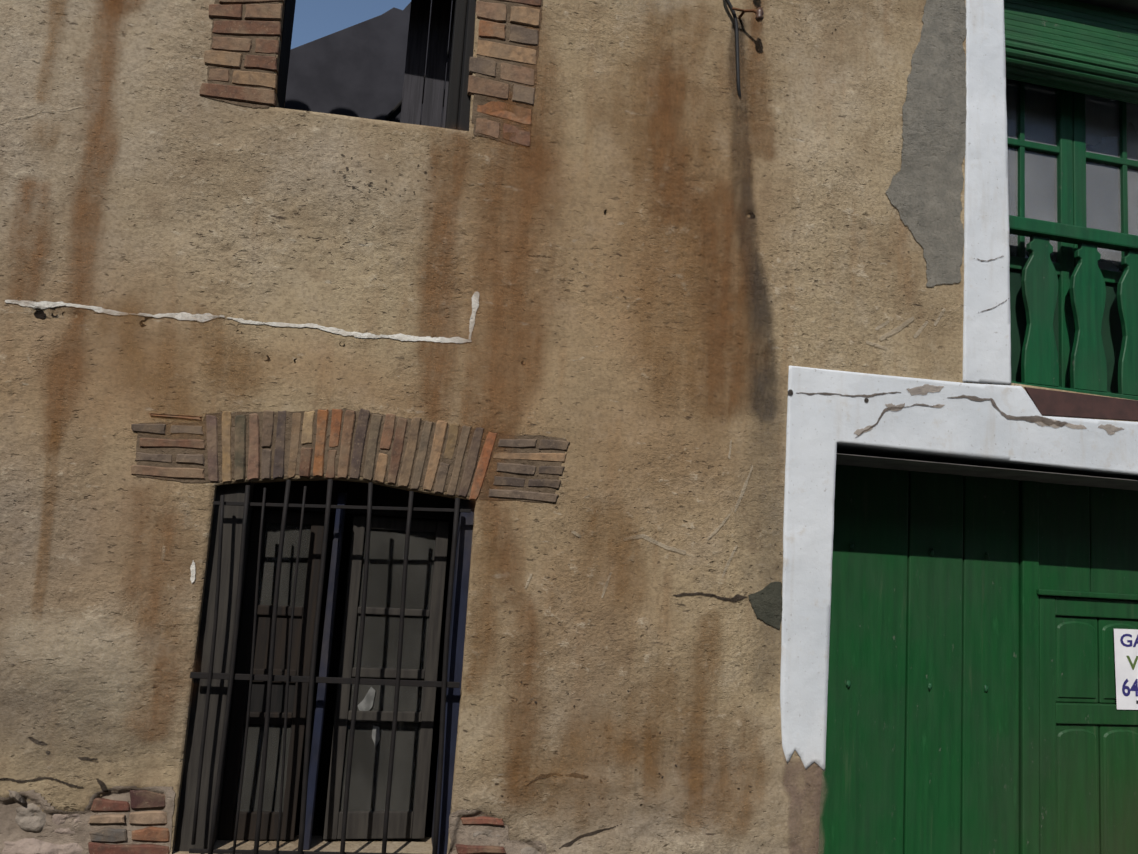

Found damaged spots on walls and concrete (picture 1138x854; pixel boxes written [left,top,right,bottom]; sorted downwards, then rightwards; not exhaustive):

crack [5,291,479,343]
crack [788,389,1087,438]
flaking render [673,582,782,629]
flaking render [0,786,175,854]
flaking render [448,809,548,854]